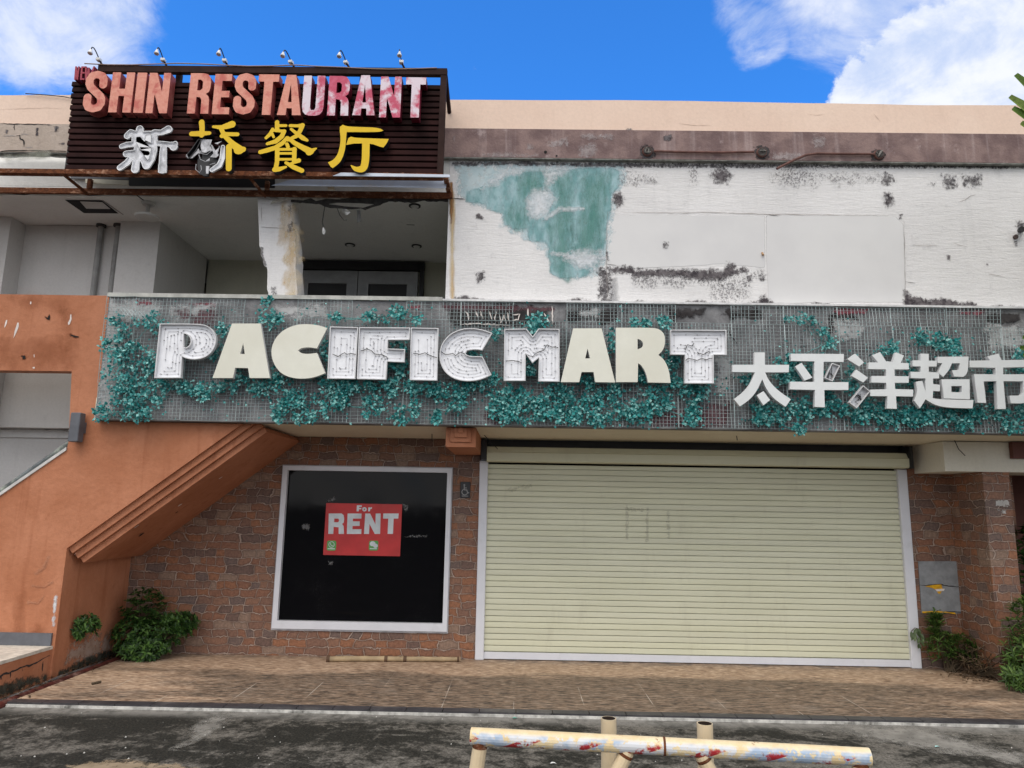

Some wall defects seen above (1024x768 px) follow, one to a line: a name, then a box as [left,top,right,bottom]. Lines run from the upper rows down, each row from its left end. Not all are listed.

water stain [452,157,1023,205]
peeling [455,161,626,281]
water stain [571,252,774,303]